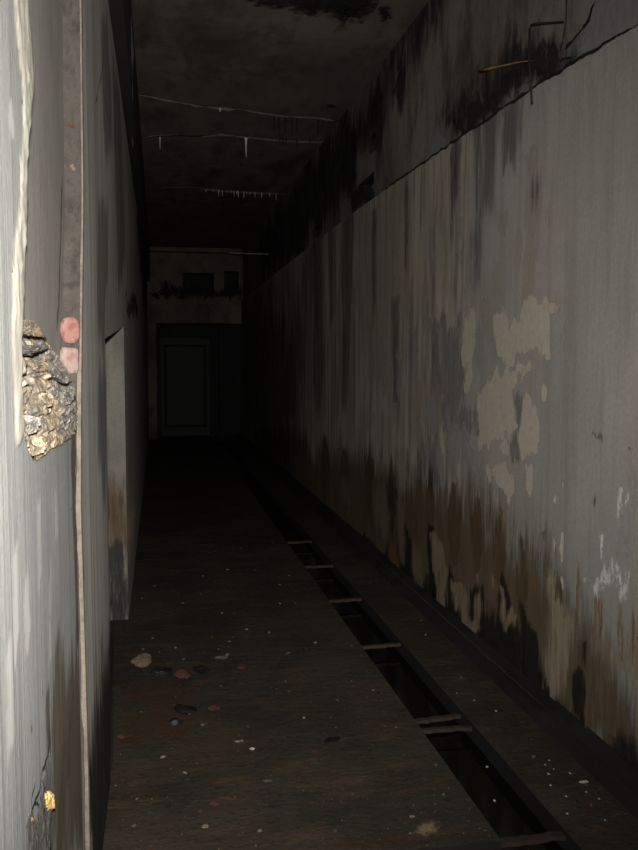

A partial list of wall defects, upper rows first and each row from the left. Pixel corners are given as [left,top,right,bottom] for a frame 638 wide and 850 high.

crack [384,0,638,190]
peeling [461,294,560,506]
damp [255,425,638,771]
crack [30,722,50,818]